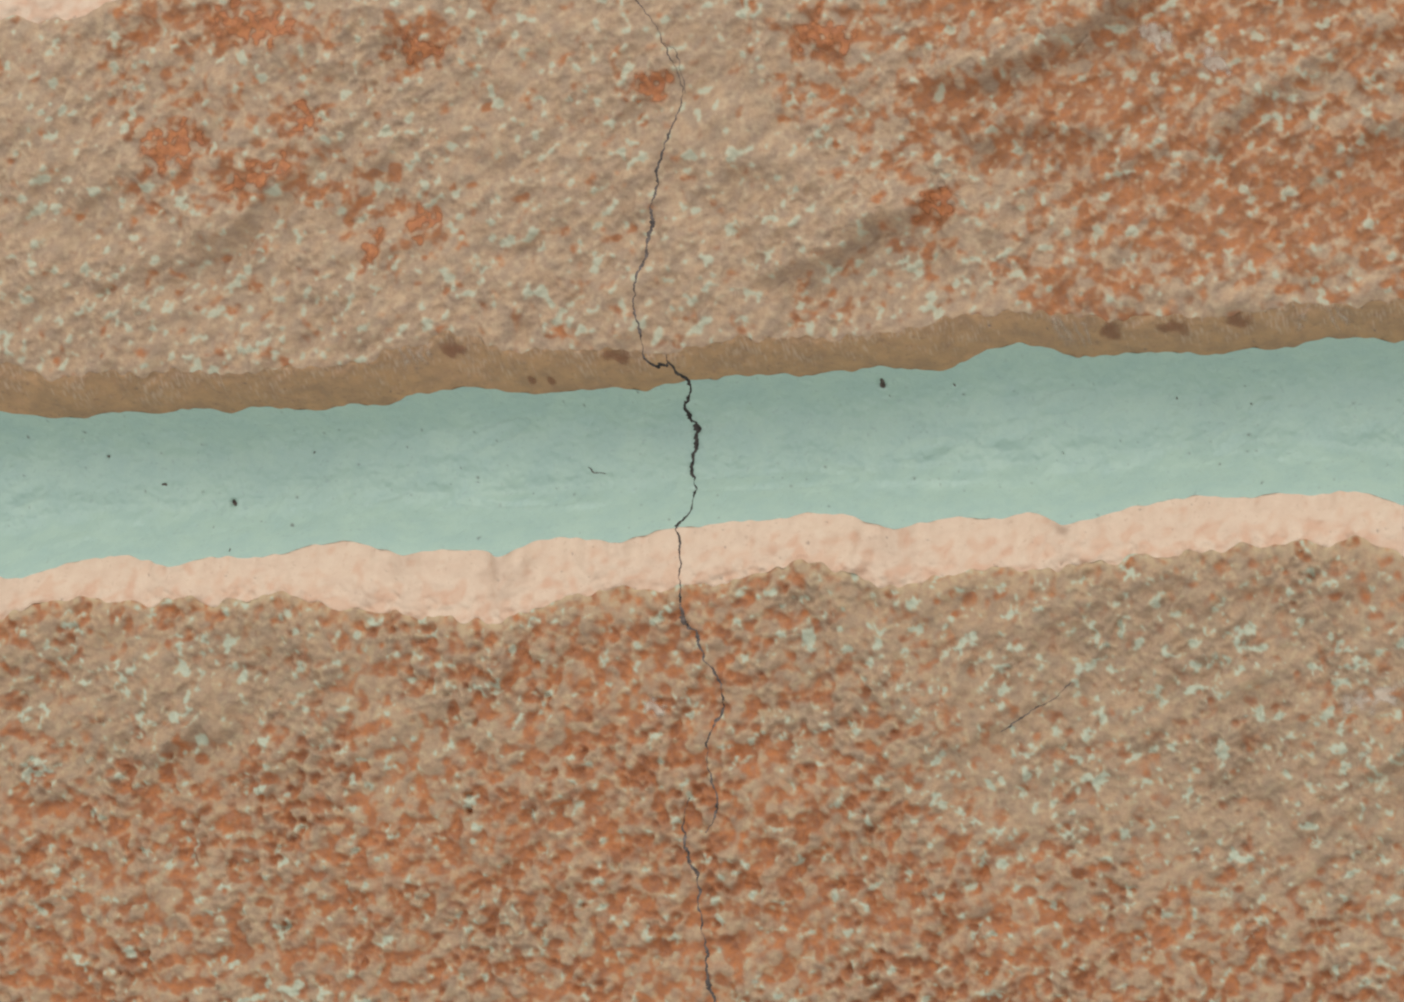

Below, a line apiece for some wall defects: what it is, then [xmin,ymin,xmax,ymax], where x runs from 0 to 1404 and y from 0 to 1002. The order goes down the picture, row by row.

crack [632,0,725,1002]